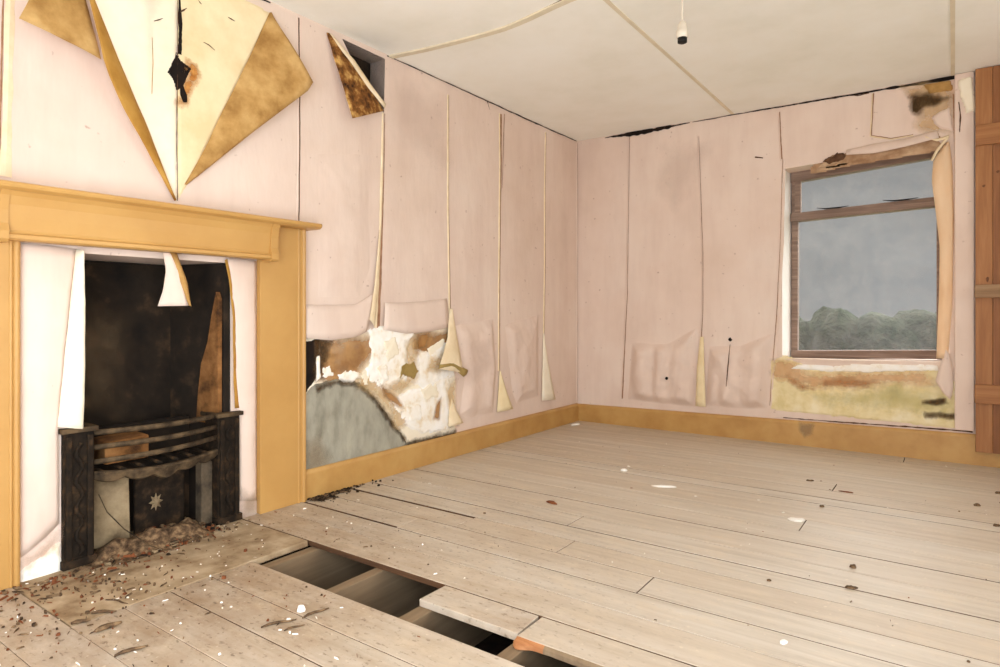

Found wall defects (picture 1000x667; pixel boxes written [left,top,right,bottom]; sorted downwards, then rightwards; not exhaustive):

flaking render [95,0,198,201]
spalling [343,39,385,108]
spalling [306,326,456,469]